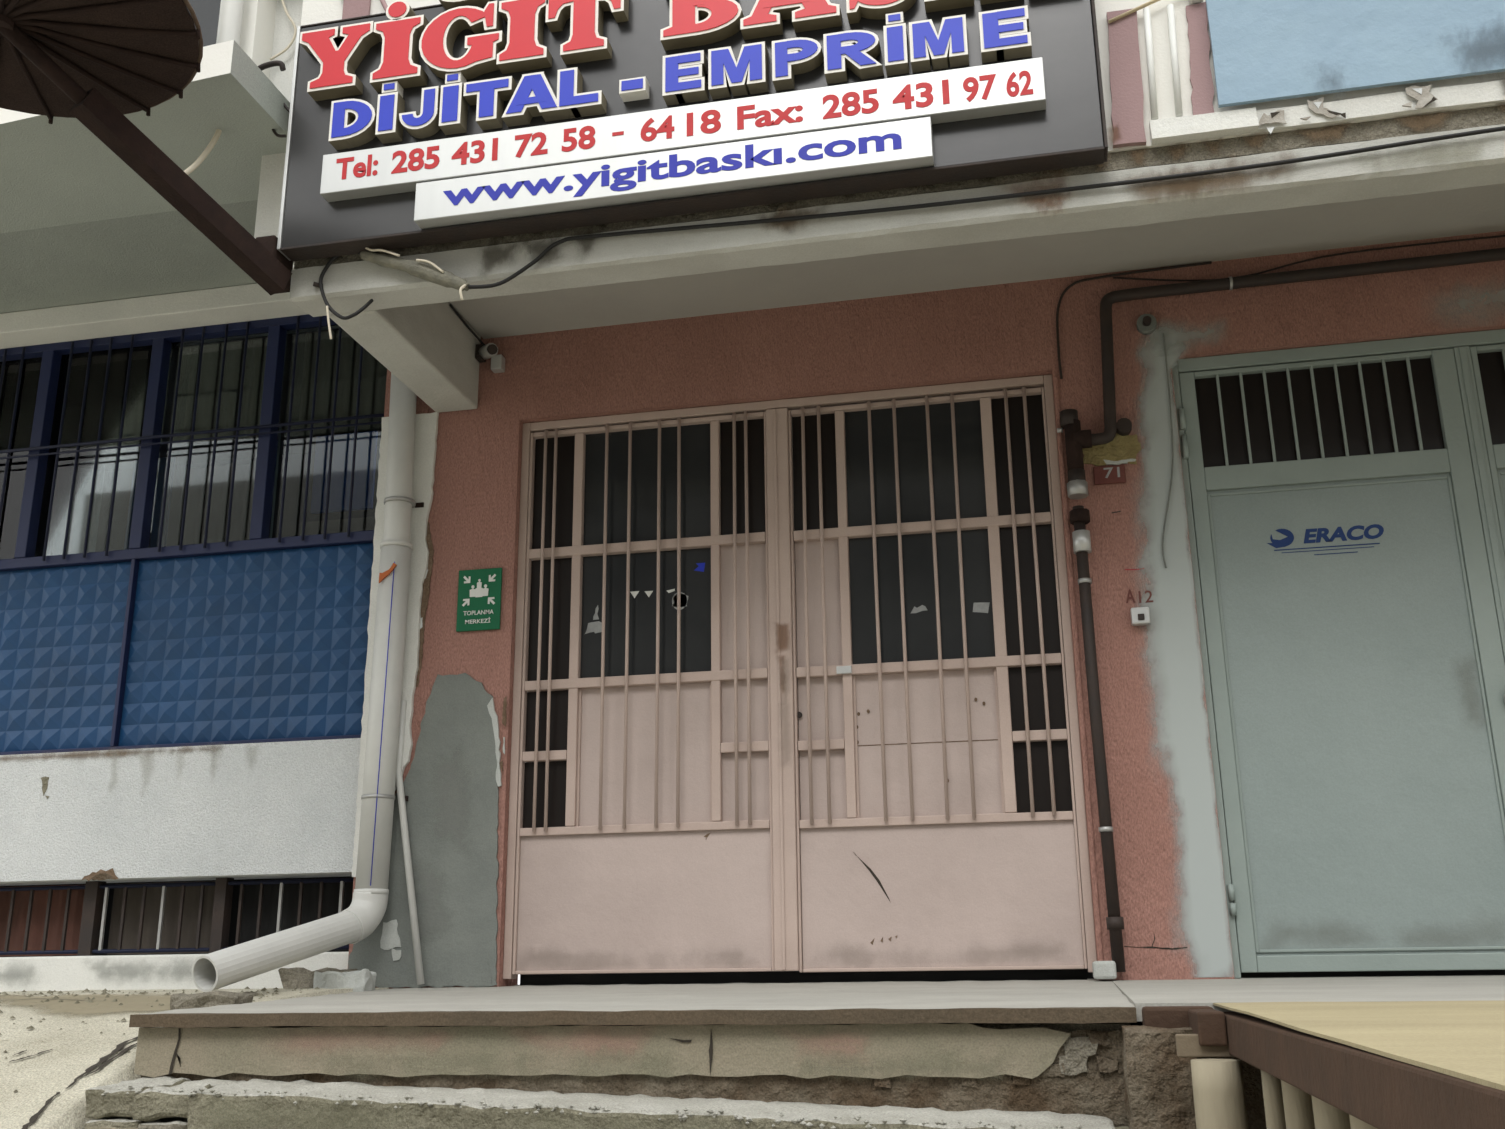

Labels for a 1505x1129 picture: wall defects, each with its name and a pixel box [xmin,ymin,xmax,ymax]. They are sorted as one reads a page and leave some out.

leakage [1133,145,1285,195]
crack [9,1049,52,1062]
crack [169,1028,181,1074]
crack [22,1037,138,1129]